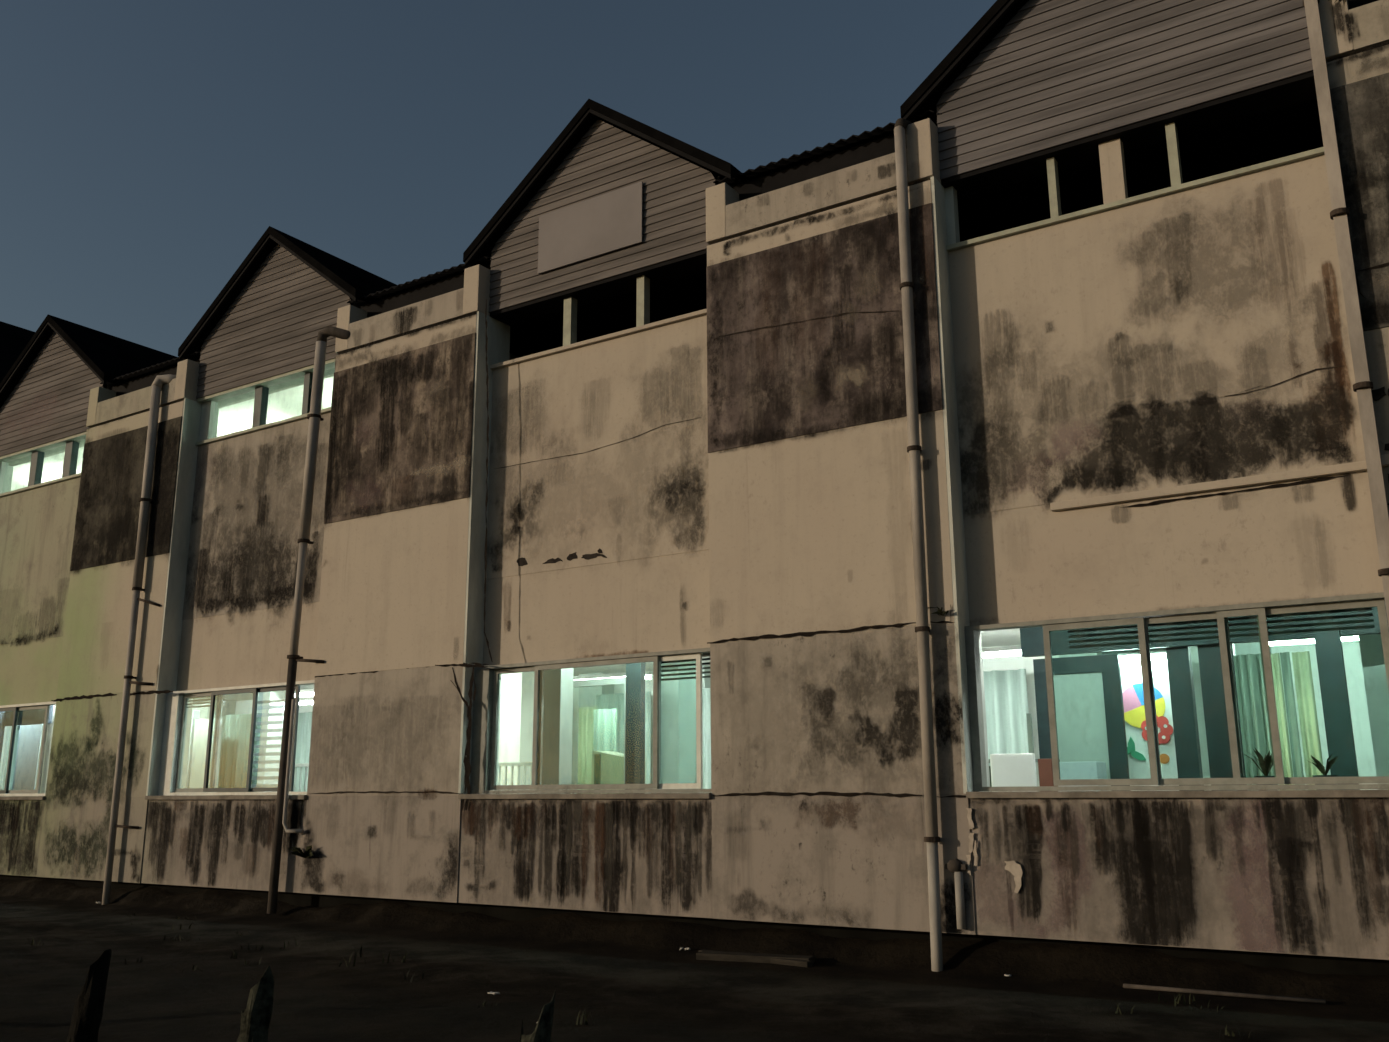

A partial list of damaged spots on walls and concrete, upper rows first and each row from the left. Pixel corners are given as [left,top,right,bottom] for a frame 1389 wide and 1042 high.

leakage [339,307,475,355]
leakage [325,375,347,513]
leakage [1110,396,1355,511]
spalling [516,548,607,566]
crack [707,604,953,644]
leakage [857,689,963,764]
leakage [0,702,143,882]
leakage [146,799,323,892]
leakage [462,799,703,912]
leakage [1019,798,1069,918]
leakage [1090,798,1195,946]
leakage [1256,798,1325,955]